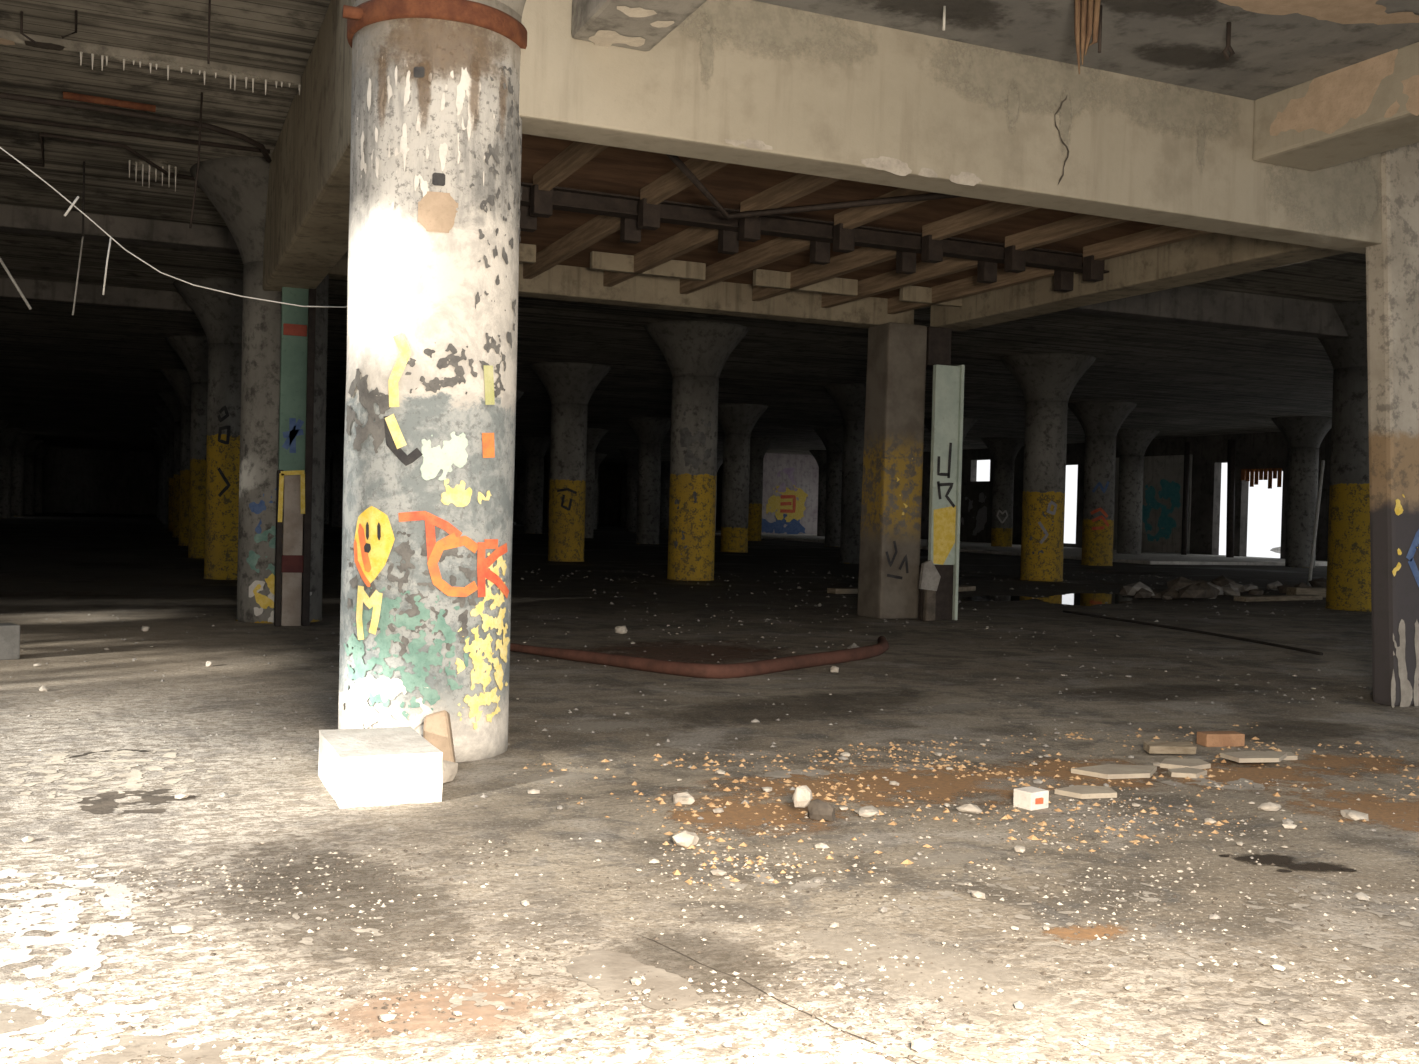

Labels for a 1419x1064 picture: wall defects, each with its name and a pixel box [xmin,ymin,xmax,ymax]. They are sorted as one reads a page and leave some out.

corrosion [378,18,507,123]
leakage [682,0,870,81]
leakage [877,0,1001,27]
crack [1055,96,1069,184]
leakage [937,44,1239,164]
leakage [1101,0,1221,18]
spalling [1218,0,1419,25]
peeling [357,56,522,398]
peeling [346,368,391,454]
peeling [339,432,526,730]
peeling [0,859,356,1064]
spalling [419,936,703,1039]